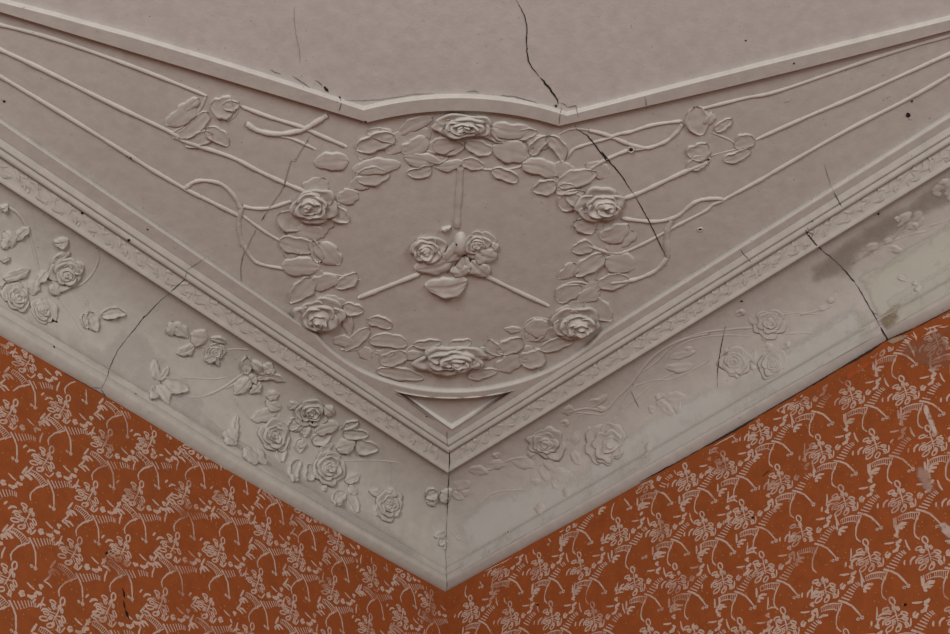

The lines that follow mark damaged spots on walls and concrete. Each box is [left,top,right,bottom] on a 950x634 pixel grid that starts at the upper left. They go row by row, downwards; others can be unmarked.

crack [272,21,430,110]
crack [500,0,666,256]
crack [66,258,205,396]
crack [641,227,950,482]